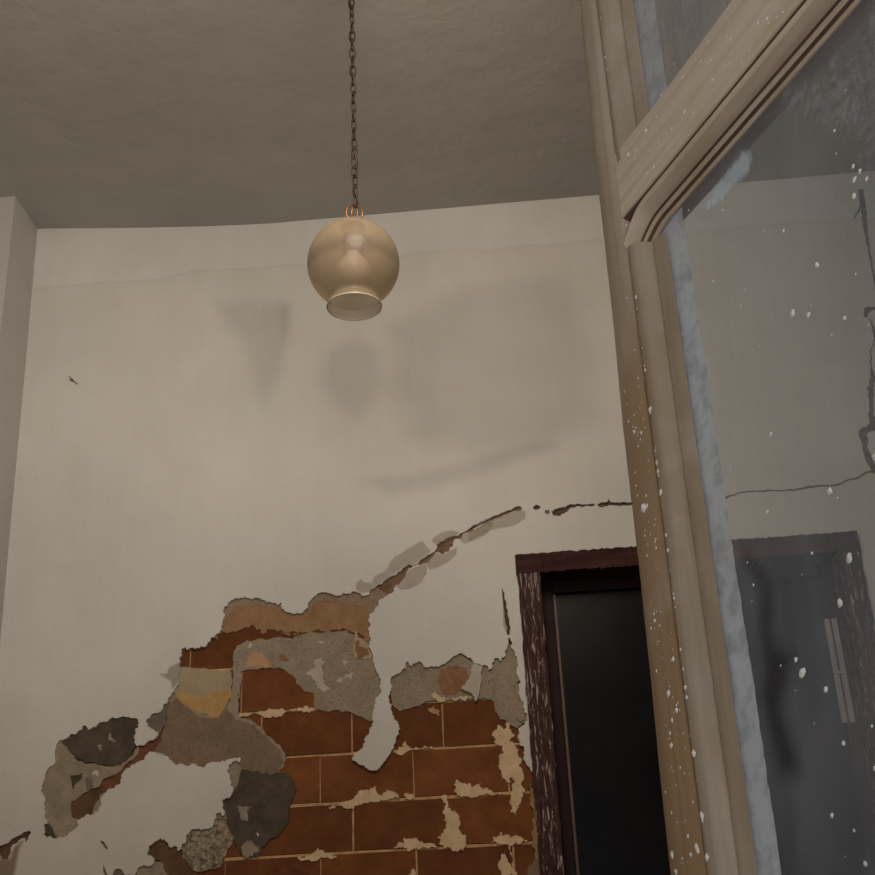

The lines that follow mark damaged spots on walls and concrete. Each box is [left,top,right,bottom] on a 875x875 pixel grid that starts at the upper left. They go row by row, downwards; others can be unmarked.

spalling [0,831,31,875]
spalling [41,587,540,875]